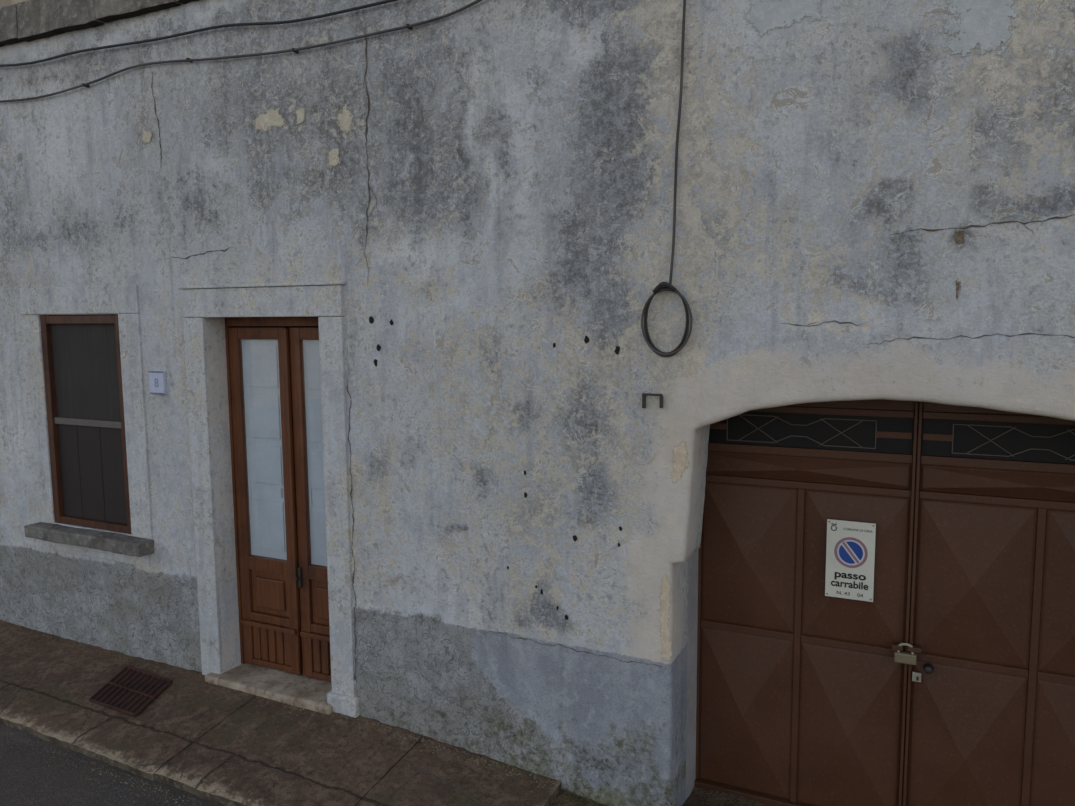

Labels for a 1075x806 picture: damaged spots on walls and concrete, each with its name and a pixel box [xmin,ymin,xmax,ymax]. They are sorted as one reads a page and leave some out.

peeling [253,107,305,132]
peeling [335,102,354,137]
peeling [328,147,341,168]
crack [891,214,1075,235]
crack [780,320,1075,344]